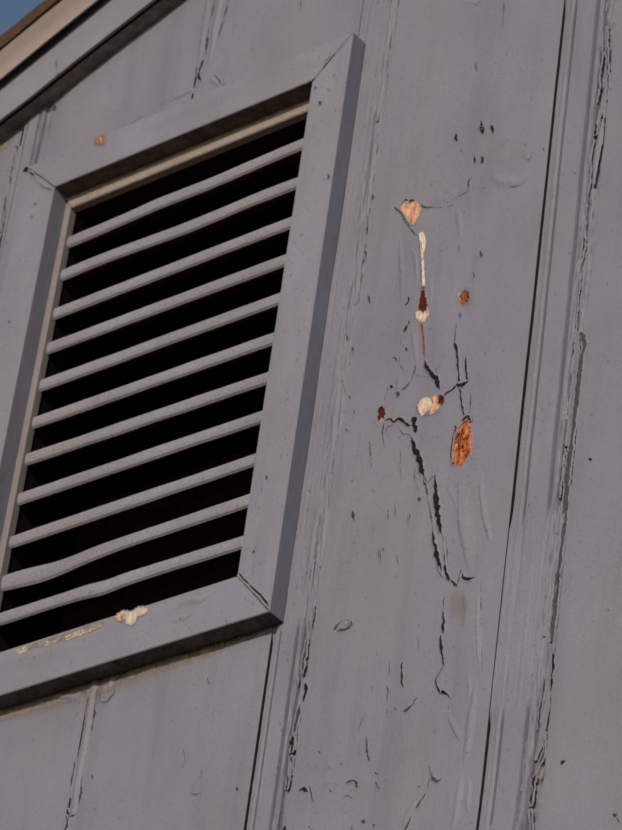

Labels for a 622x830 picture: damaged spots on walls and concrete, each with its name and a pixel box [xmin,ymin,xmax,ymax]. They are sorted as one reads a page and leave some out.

crack [182,0,230,92]
crack [357,138,380,305]
peeling [393,198,431,311]
corrosion [414,284,431,353]
corrosion [456,289,472,304]
corrosion [376,403,388,426]
peeling [416,384,457,418]
peeling [447,413,476,469]
crack [515,0,611,830]
crack [272,292,475,830]
peeling [114,606,150,627]
crack [63,704,98,830]